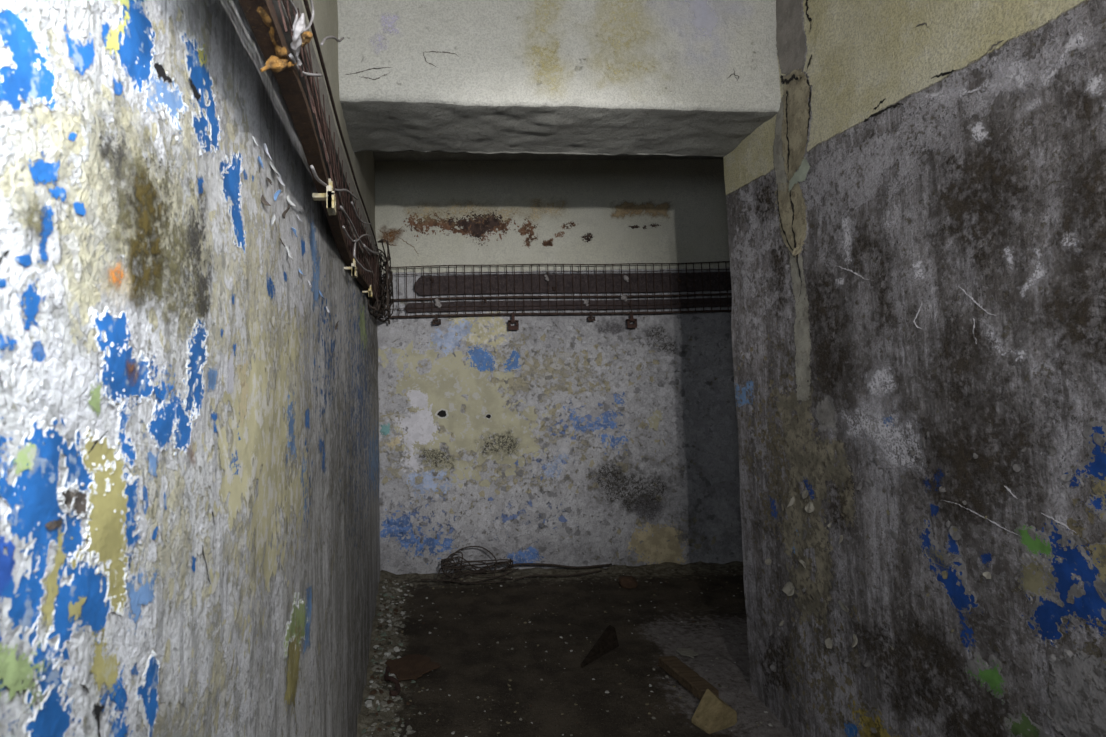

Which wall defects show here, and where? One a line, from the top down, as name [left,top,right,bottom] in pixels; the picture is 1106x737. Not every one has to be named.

peeling [0,2,61,113]
damp [98,133,213,327]
peeling [64,0,248,254]
rust [378,226,418,254]
crack [777,0,812,296]
damp [939,122,1026,270]
damp [921,32,1088,102]
peeling [0,136,339,737]
peeling [358,300,569,567]
damp [844,365,1050,523]
peeling [906,467,1106,737]
crack [80,683,105,737]